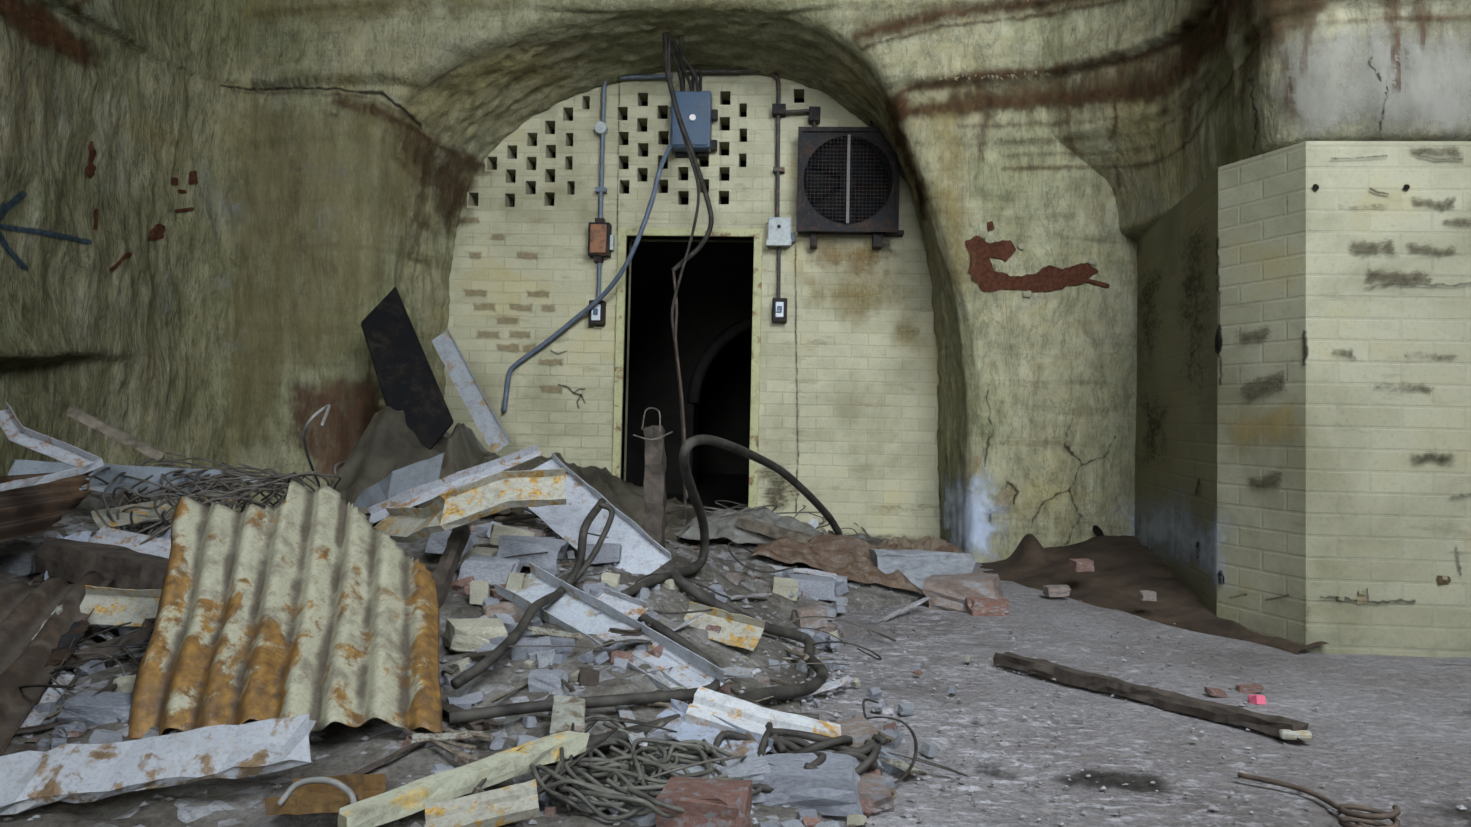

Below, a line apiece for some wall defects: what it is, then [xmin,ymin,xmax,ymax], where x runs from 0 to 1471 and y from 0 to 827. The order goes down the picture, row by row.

corrosion [0,0,92,64]
corrosion [1388,0,1443,85]
crack [220,85,422,129]
corrosion [854,0,1327,220]
leakage [232,107,415,445]
crack [984,390,992,467]
leakage [944,479,995,551]
crack [1032,425,1116,544]